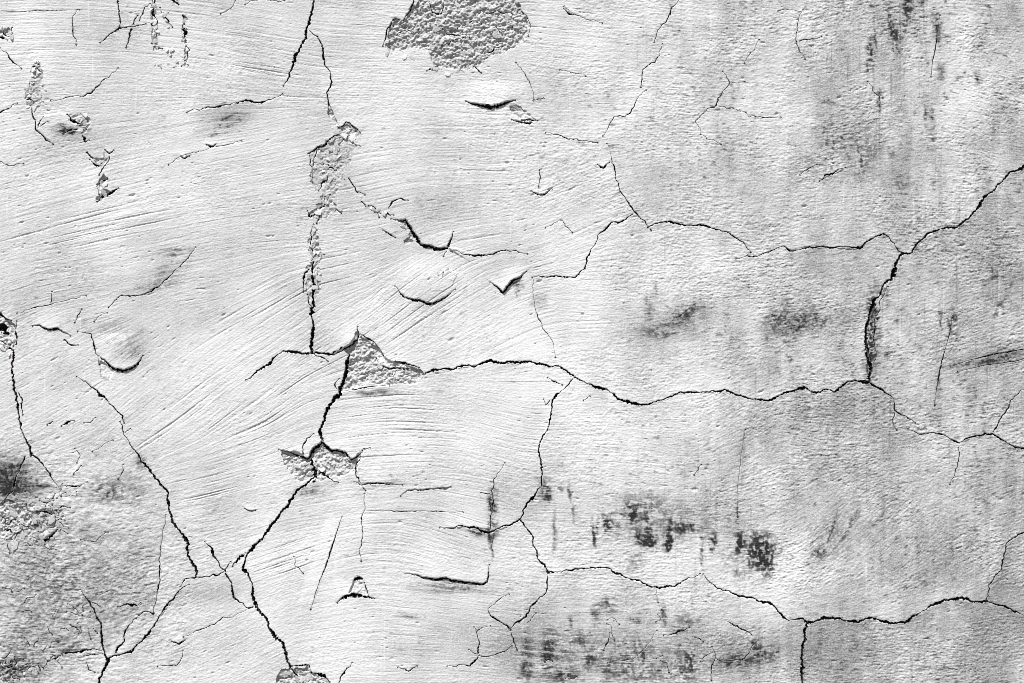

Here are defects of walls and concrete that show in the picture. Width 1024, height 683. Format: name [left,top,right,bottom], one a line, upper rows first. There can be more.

spalling [382,0,532,76]
spalling [305,106,361,308]
crack [348,178,394,218]
crack [0,0,370,683]
spalling [319,321,425,393]
crack [425,0,1024,683]
peeling [276,422,454,498]
leakage [628,501,717,564]
leakage [735,531,776,575]